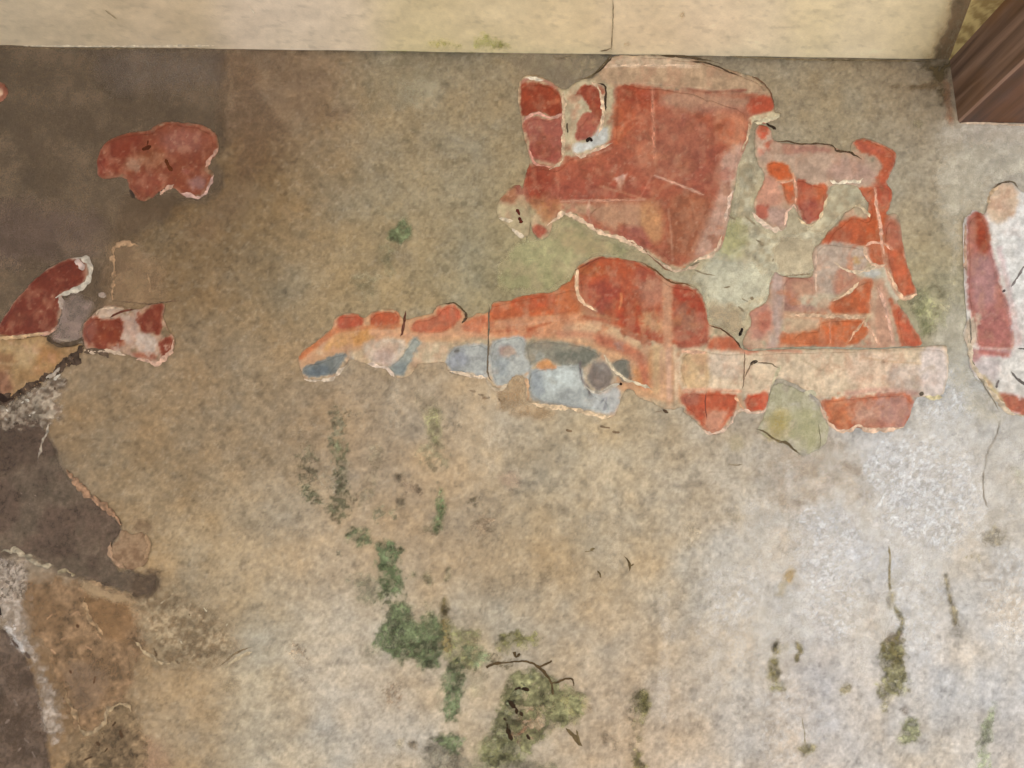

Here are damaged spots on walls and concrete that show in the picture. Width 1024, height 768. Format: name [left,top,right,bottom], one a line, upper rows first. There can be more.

water stain [0,45,228,343]
flaking render [98,240,174,305]
flaking render [53,295,89,343]
water stain [0,558,37,661]
water stain [37,675,62,744]